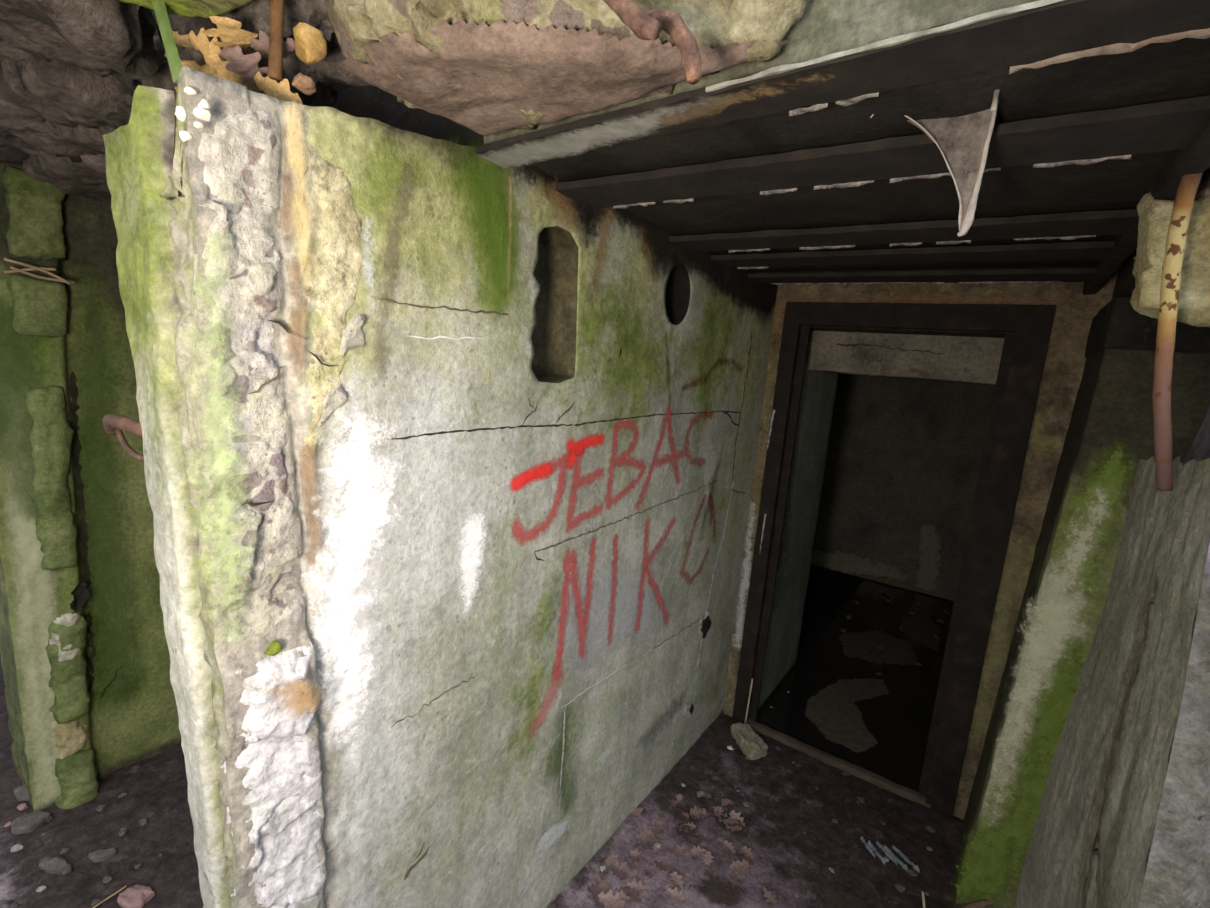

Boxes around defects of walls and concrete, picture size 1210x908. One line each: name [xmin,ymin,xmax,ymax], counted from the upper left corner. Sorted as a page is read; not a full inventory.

spalling [186,107,304,643]
rust [279,106,311,376]
rust [300,445,322,563]
spalling [302,145,366,455]
crack [380,298,509,340]
crack [387,334,769,707]
water stain [459,97,724,296]
water stain [814,181,874,190]
water stain [1033,155,1131,168]
spalling [220,642,327,908]
crack [404,842,430,881]
water stain [988,488,1109,826]